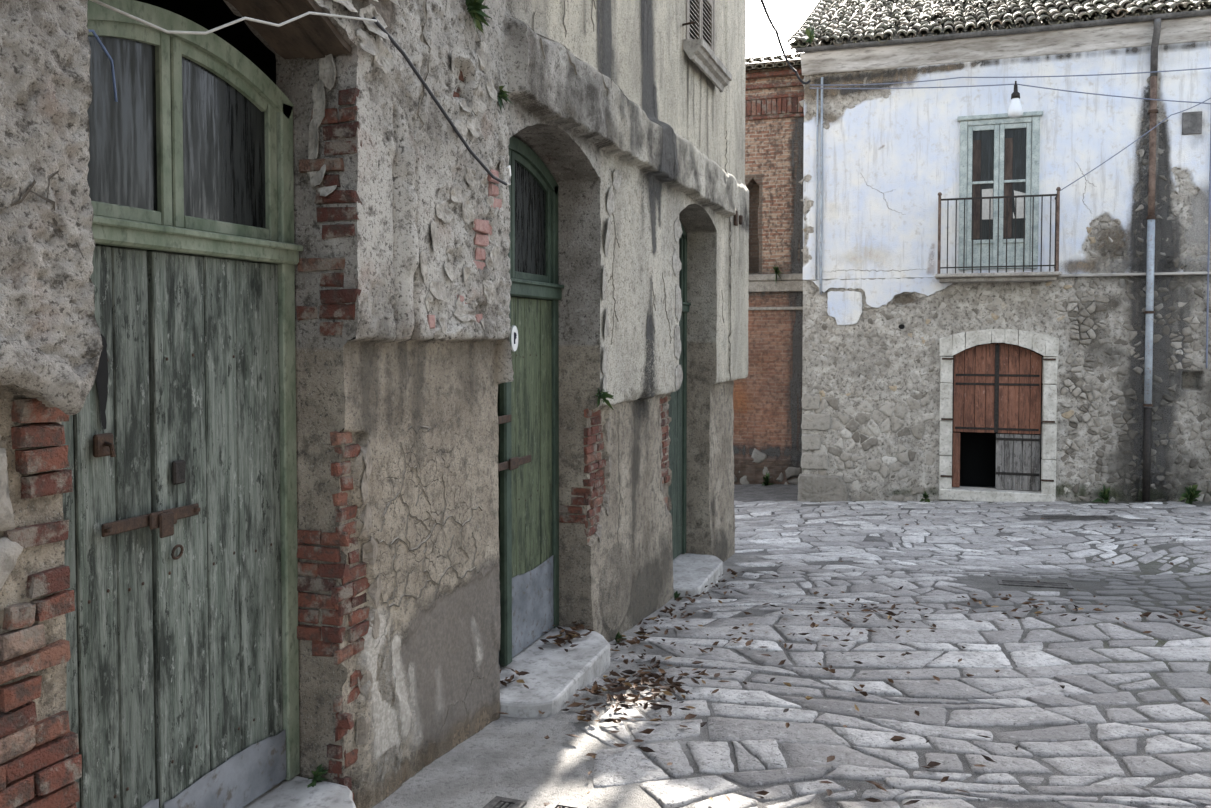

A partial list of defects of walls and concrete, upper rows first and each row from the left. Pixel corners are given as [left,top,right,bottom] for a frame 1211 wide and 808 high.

spalling [299,54,362,240]
peeling [420,156,504,335]
water stain [597,0,613,79]
water stain [607,0,679,254]
peeling [658,219,683,516]
peeling [813,278,952,325]
water stain [1067,86,1211,502]
spalling [0,398,73,590]
spalling [0,565,82,808]
spalling [297,430,382,802]
water stain [354,615,501,808]
crack [375,425,490,648]